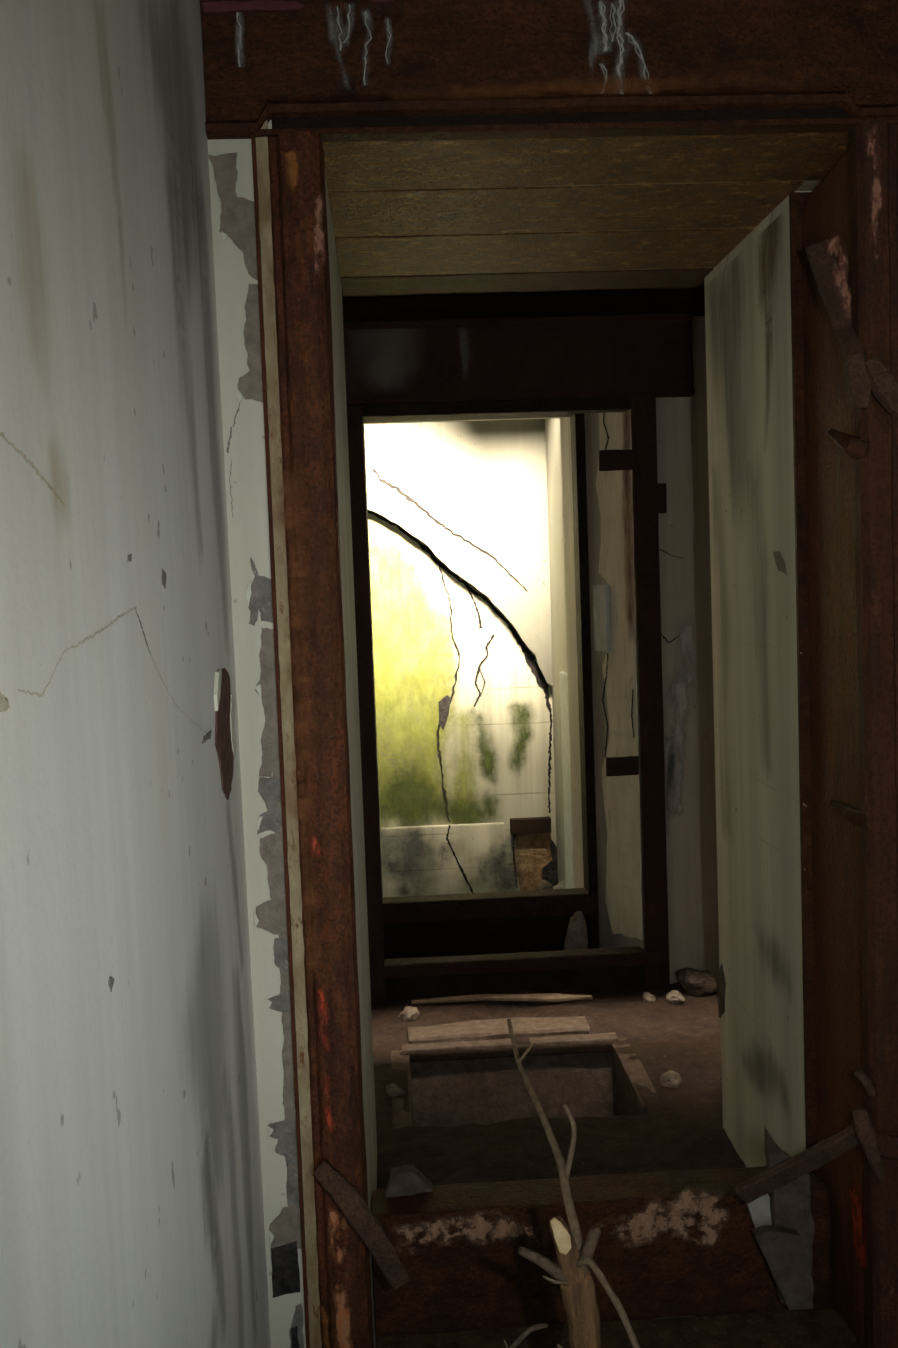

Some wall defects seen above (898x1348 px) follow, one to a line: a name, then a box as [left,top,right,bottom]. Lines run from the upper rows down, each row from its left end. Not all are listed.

peeling [284,150,298,189]
peeling [209,152,265,404]
crack [18,606,205,733]
spalling [202,668,237,800]
crack [368,468,552,893]
peeling [245,557,304,1348]
peeling [330,1210,345,1263]
peeling [396,1212,534,1245]
peeling [617,1190,727,1246]
peeling [321,1286,350,1348]